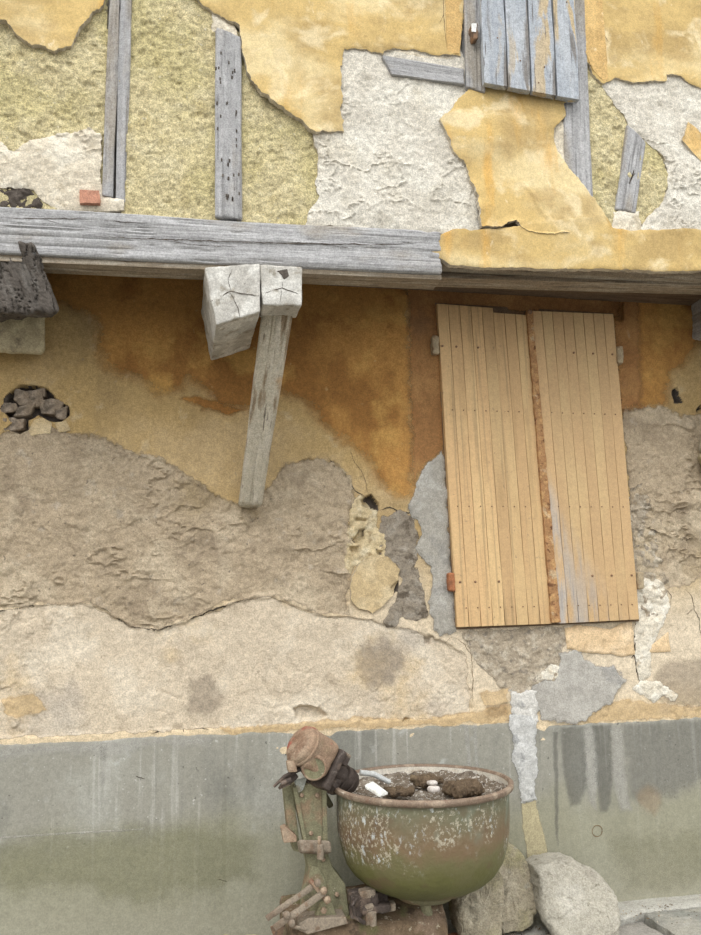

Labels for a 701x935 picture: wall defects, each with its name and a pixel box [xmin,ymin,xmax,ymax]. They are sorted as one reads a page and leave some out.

flaking render [211,14,238,36]
flaking render [0,127,125,213]
flaking render [305,49,701,234]
flaking render [0,386,566,739]
flaking render [622,389,701,703]